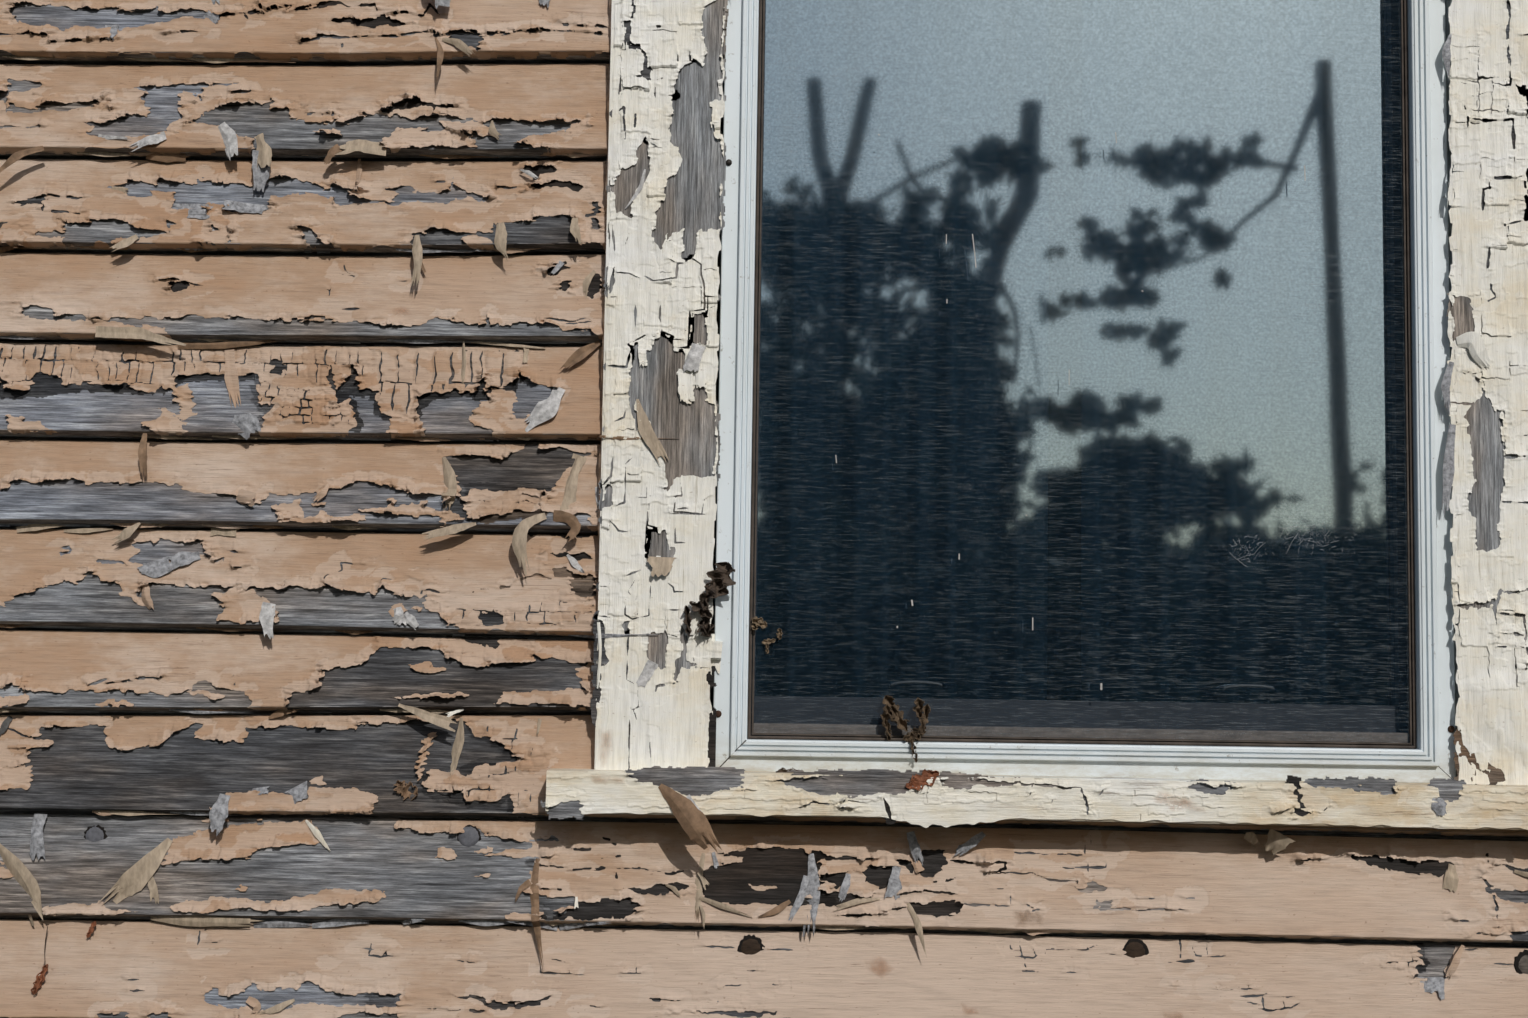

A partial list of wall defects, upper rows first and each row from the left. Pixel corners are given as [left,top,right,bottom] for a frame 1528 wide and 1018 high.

crack [0,217,721,770]
peeling [0,0,1210,1018]
peeling [1441,0,1528,682]
peeling [1176,779,1251,807]
peeling [1244,718,1528,1000]